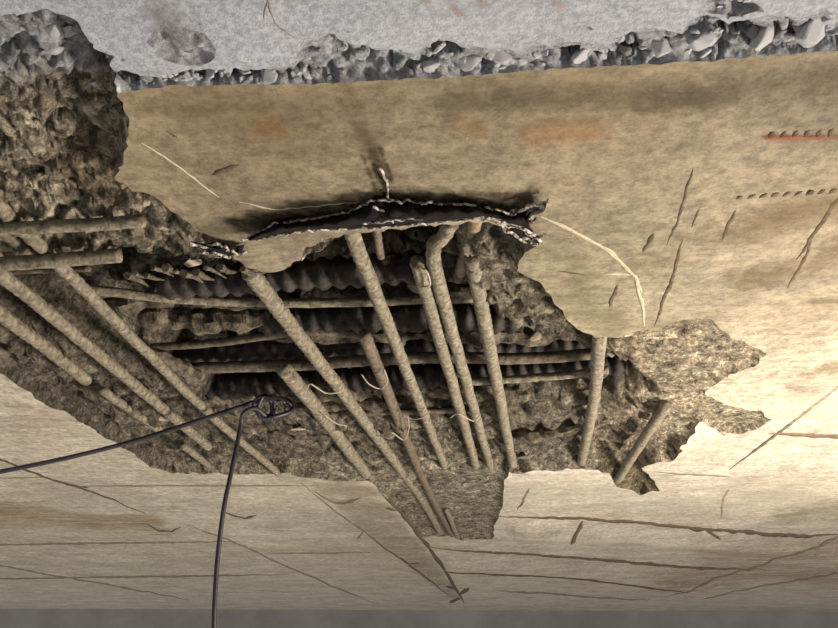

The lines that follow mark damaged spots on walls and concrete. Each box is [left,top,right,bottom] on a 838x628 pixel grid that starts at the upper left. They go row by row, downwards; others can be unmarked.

crack [263,0,296,39]
spalling [705,0,764,20]
rust [765,129,837,140]
water stain [229,147,538,231]
spalling [0,9,838,443]
crack [642,169,700,326]
crack [722,210,736,241]
crack [787,198,838,288]
crack [608,285,618,307]
spalling [90,221,772,540]
crack [0,459,373,603]
crack [300,482,838,603]